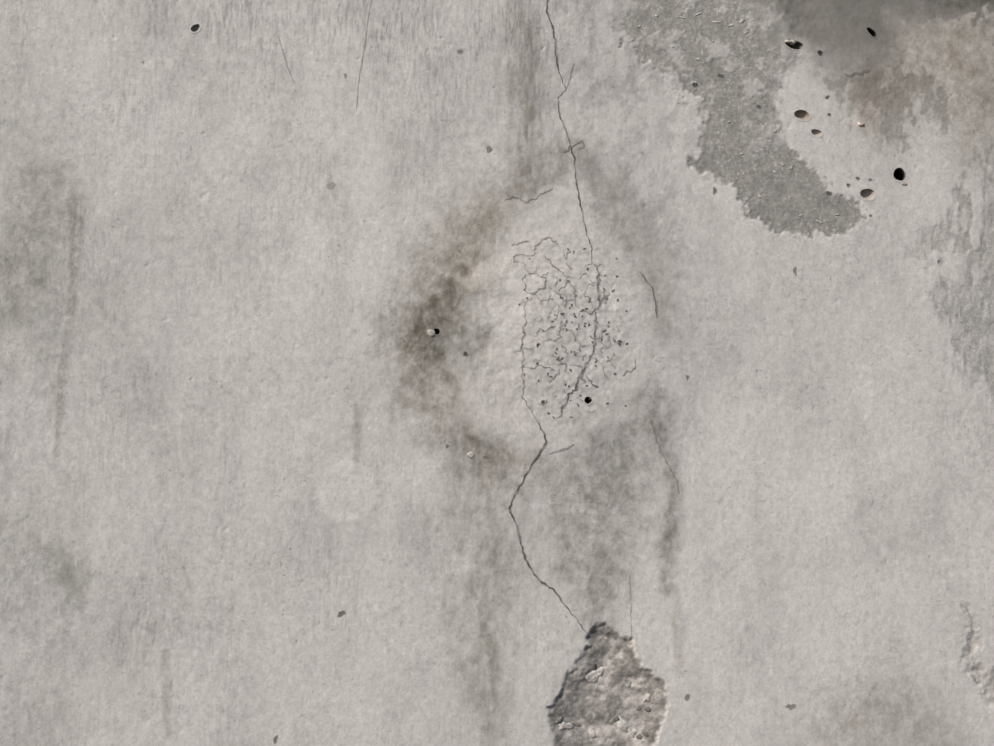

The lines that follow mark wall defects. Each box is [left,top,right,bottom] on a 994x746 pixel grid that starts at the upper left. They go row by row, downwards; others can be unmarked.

leakage [347,0,699,746]
crack [505,0,657,637]
peeling [592,0,994,424]
leakage [750,0,994,98]
spalling [546,621,670,746]